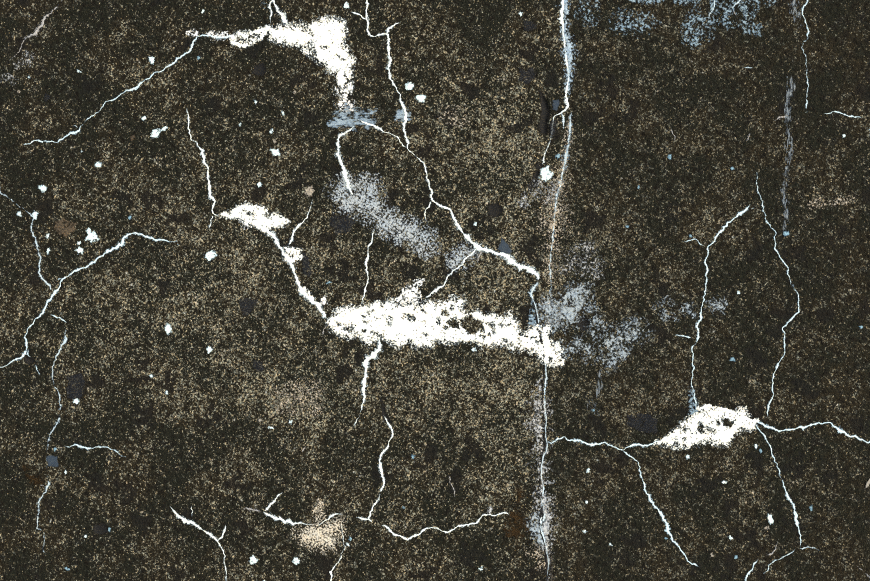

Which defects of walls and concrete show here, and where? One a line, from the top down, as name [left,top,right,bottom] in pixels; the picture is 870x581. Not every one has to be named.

crack [23,34,231,145]
leakage [186,15,378,132]
crack [0,191,178,552]
leakage [220,200,291,232]
crack [253,200,326,333]
leakage [283,246,303,264]
leakage [298,242,653,414]
crack [334,0,697,581]
leakage [652,295,696,321]
leakage [653,387,760,450]
crack [678,172,870,581]
crack [244,415,509,581]